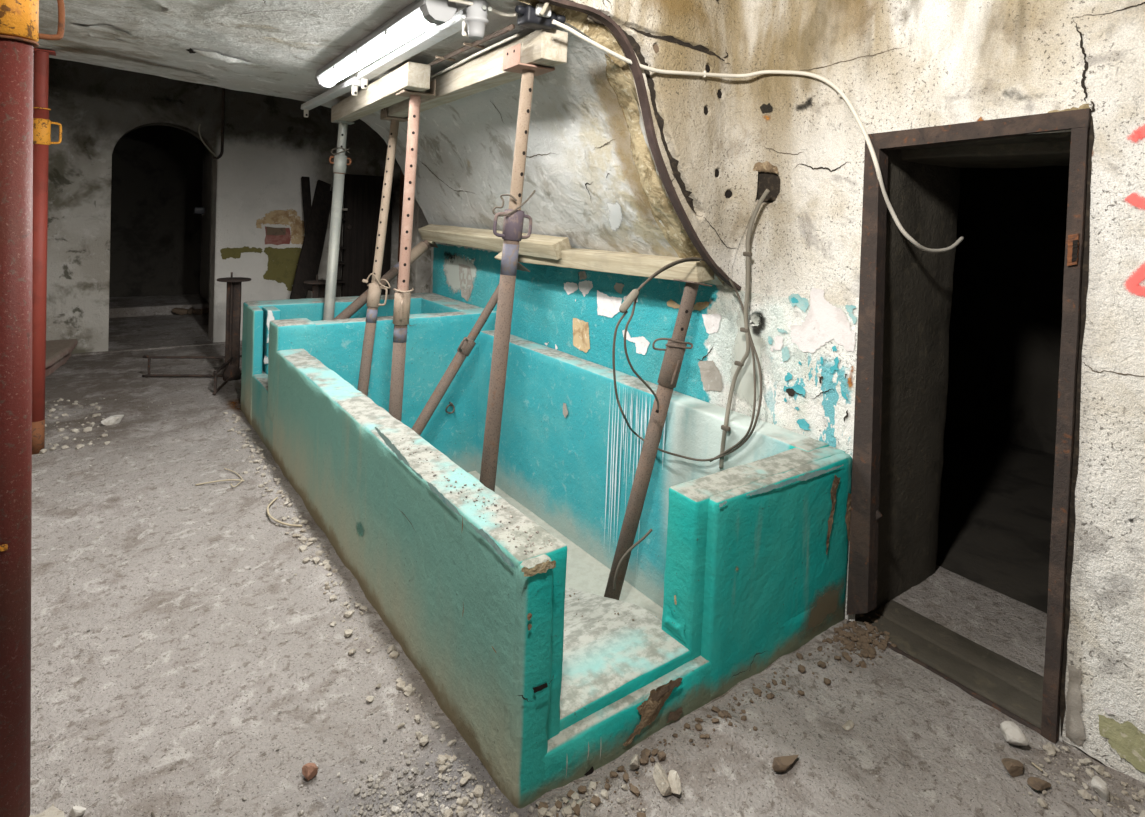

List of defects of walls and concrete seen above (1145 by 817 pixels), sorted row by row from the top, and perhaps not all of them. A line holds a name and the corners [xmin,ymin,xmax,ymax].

crack [589,0,733,249]
peeling [220,209,305,291]
flaking render [768,288,857,430]
crack [1060,2,1145,767]
spalling [623,678,683,746]
spalling [1065,665,1085,745]
peeling [1098,708,1145,773]